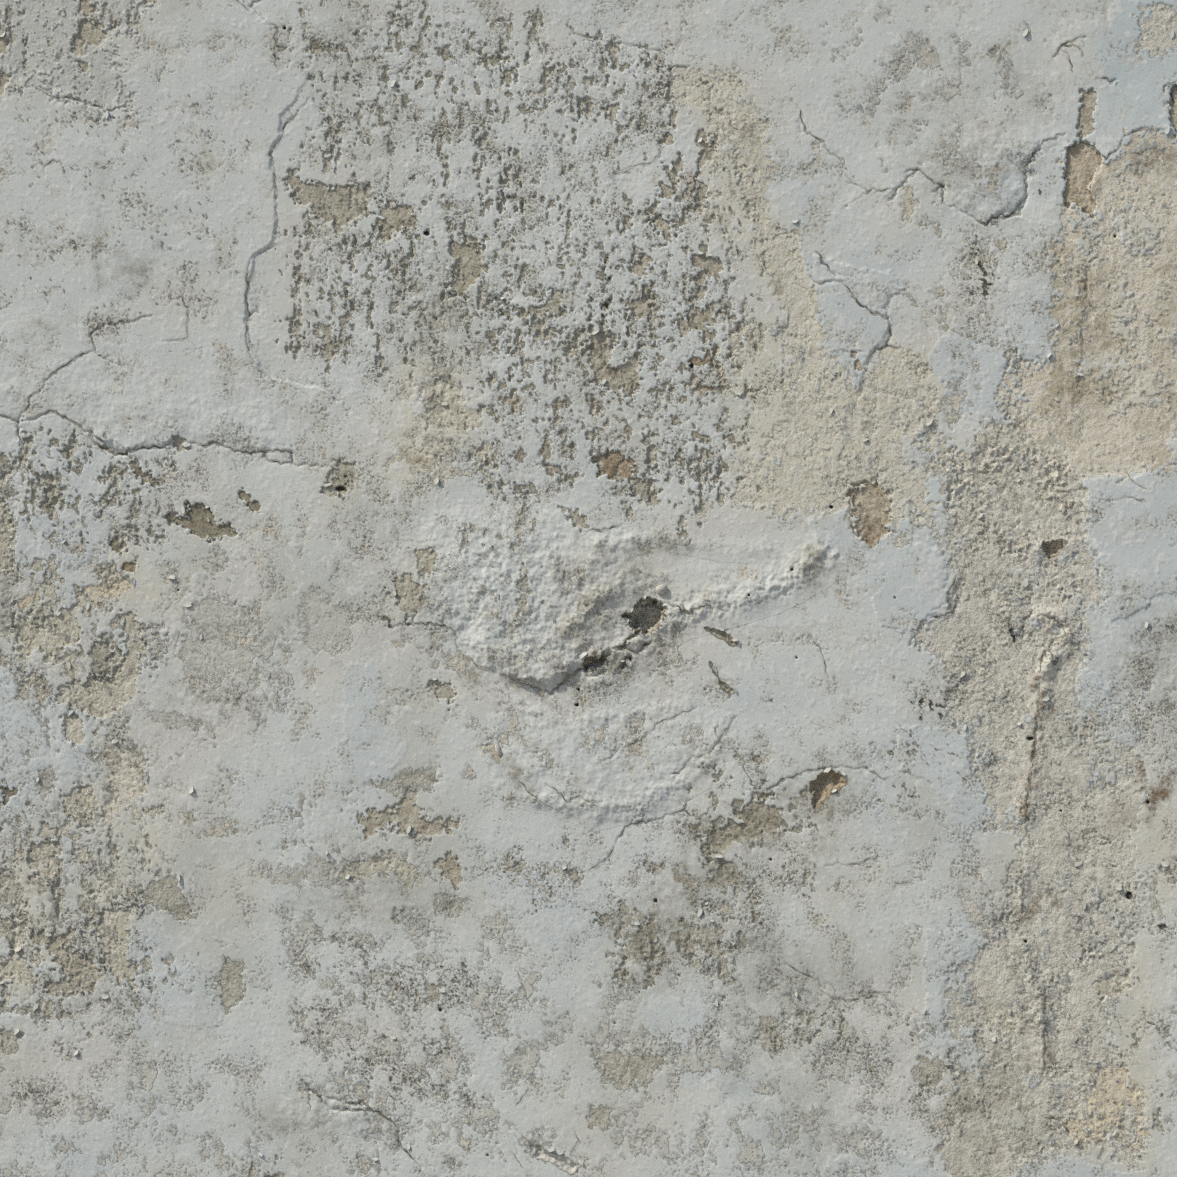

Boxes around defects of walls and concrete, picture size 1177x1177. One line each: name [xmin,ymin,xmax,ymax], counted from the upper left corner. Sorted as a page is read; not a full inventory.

crack [1054,37,1116,82]
crack [46,93,126,112]
crack [797,81,1177,226]
crack [245,110,298,351]
crack [811,252,892,364]
crack [0,315,321,468]
peeling [259,0,1177,1177]
crack [604,709,693,761]
crack [670,718,894,793]
crack [590,803,711,870]
peeling [0,1087,109,1170]
peeling [198,1128,301,1177]